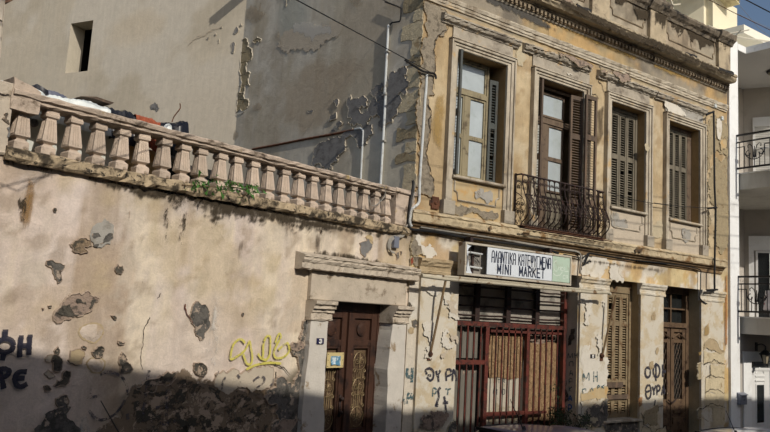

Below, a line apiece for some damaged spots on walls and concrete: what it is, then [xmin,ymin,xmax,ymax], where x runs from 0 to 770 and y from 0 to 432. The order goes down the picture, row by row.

spalling [231,23,262,112]
peeling [311,66,410,170]
spalling [415,1,447,198]
leakage [562,0,733,78]
spalling [45,259,65,284]
spalling [41,290,100,324]
peeling [69,219,114,255]
peeling [189,301,211,341]
leakage [89,177,381,262]
peeling [34,345,105,432]
spalling [96,320,307,432]
peeling [419,411,457,432]